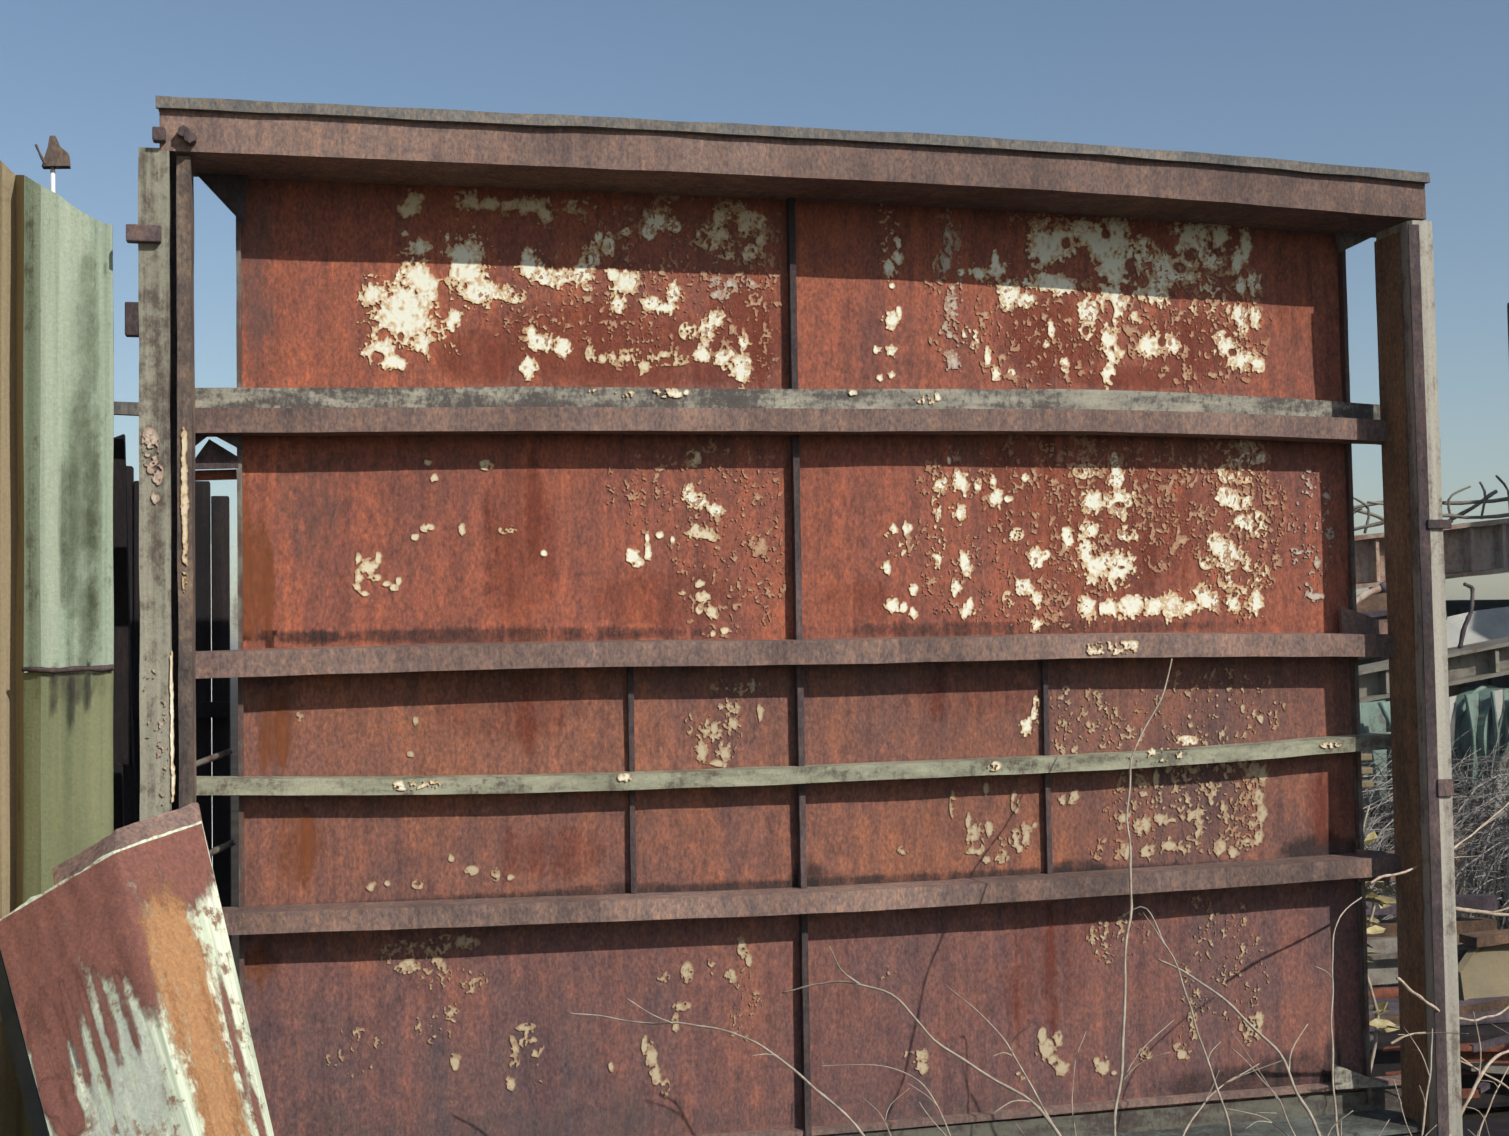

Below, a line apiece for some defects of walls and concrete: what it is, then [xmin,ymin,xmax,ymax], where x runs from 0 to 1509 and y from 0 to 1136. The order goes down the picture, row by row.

peeling [356,188,788,398]
rust [486,308,671,380]
rust [695,287,774,383]
peeling [924,208,1273,393]
rust [1009,302,1233,388]
rust [243,492,274,638]
peeling [607,434,792,640]
peeling [880,435,1334,655]
peeling [393,780,440,791]
peeling [949,790,1038,864]
peeling [1018,667,1286,862]
rust [0,823,267,1136]